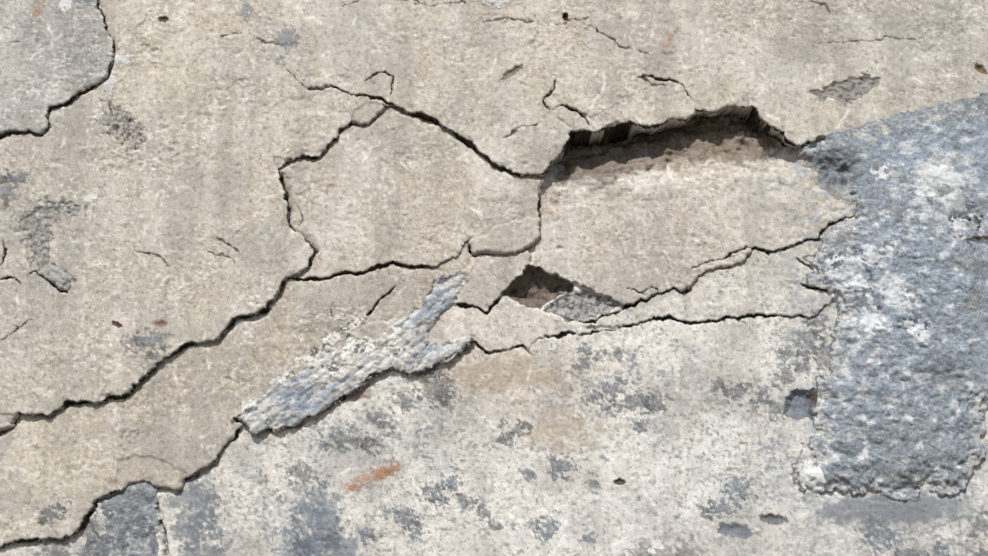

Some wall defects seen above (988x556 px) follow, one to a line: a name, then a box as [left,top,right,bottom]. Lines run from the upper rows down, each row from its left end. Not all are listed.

flaking render [0,0,114,135]
spalling [94,99,147,152]
spalling [809,70,880,106]
crack [814,35,915,44]
crack [0,0,849,435]
spalling [502,115,853,322]
spalling [0,241,480,547]
crack [181,367,422,491]
crack [1,488,126,548]
peeling [154,505,169,556]